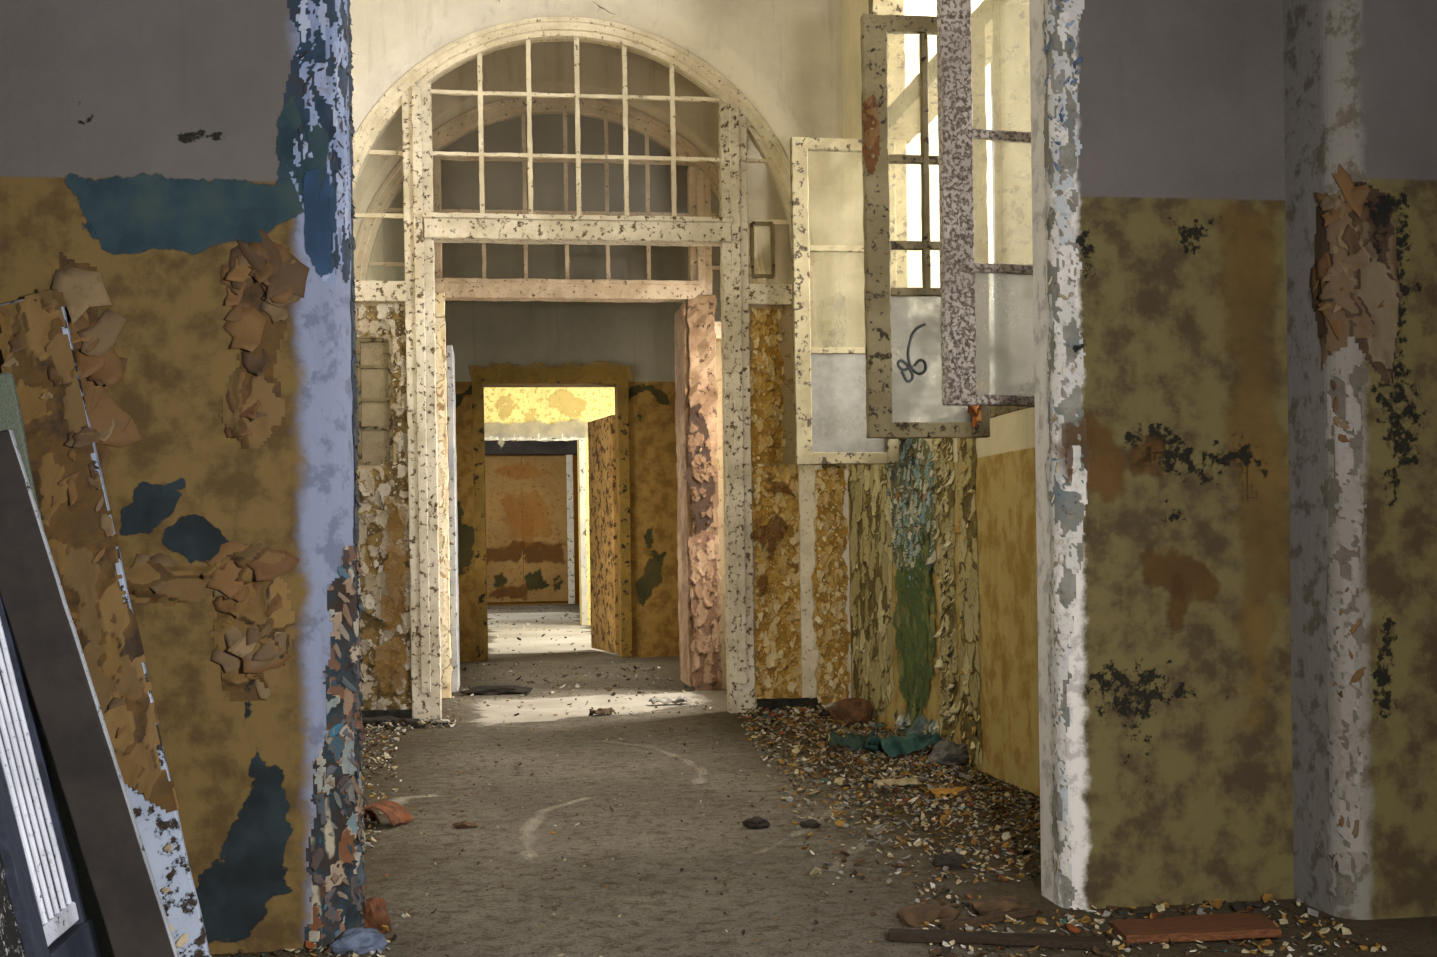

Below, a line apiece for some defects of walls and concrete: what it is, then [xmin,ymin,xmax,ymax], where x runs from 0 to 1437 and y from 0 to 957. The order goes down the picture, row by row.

peeling [862,94,881,174]
peeling [210,0,412,950]
peeling [687,521,721,687]
peeling [749,307,983,767]
peeling [1042,0,1088,909]